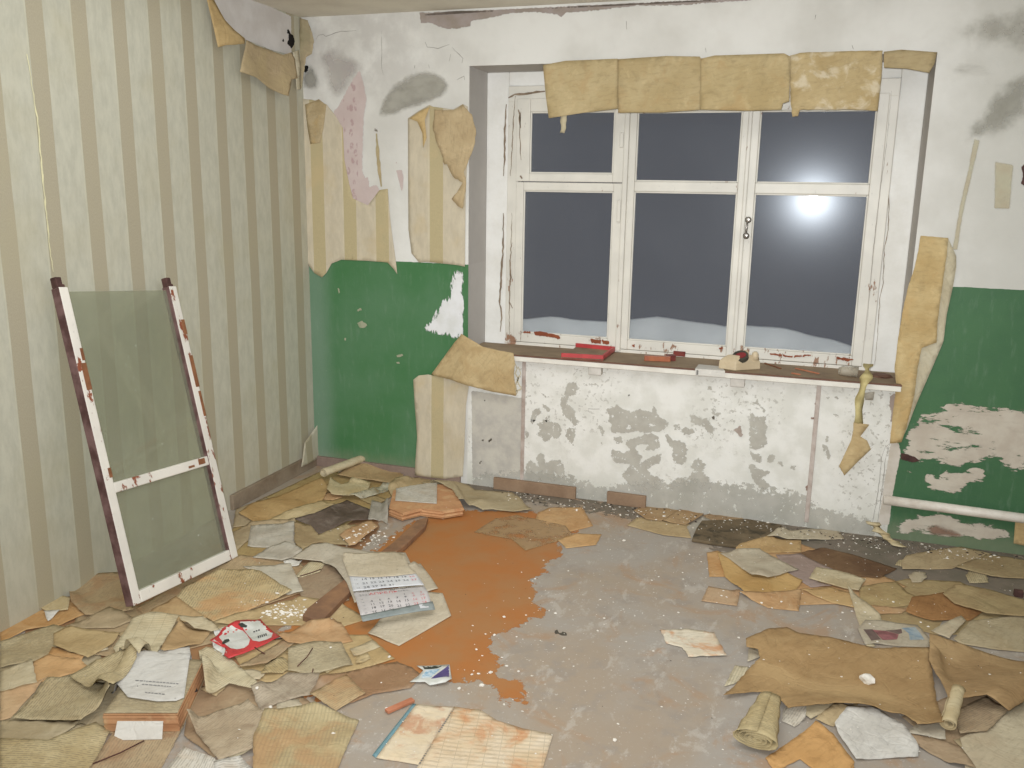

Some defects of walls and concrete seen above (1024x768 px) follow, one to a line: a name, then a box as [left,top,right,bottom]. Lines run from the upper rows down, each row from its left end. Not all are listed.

flaking render [214,0,295,54]
leakage [382,74,446,113]
peeling [425,271,464,338]
flaking render [471,382,578,481]
peeling [599,404,721,493]
peeling [734,400,796,491]
peeling [878,402,1024,540]